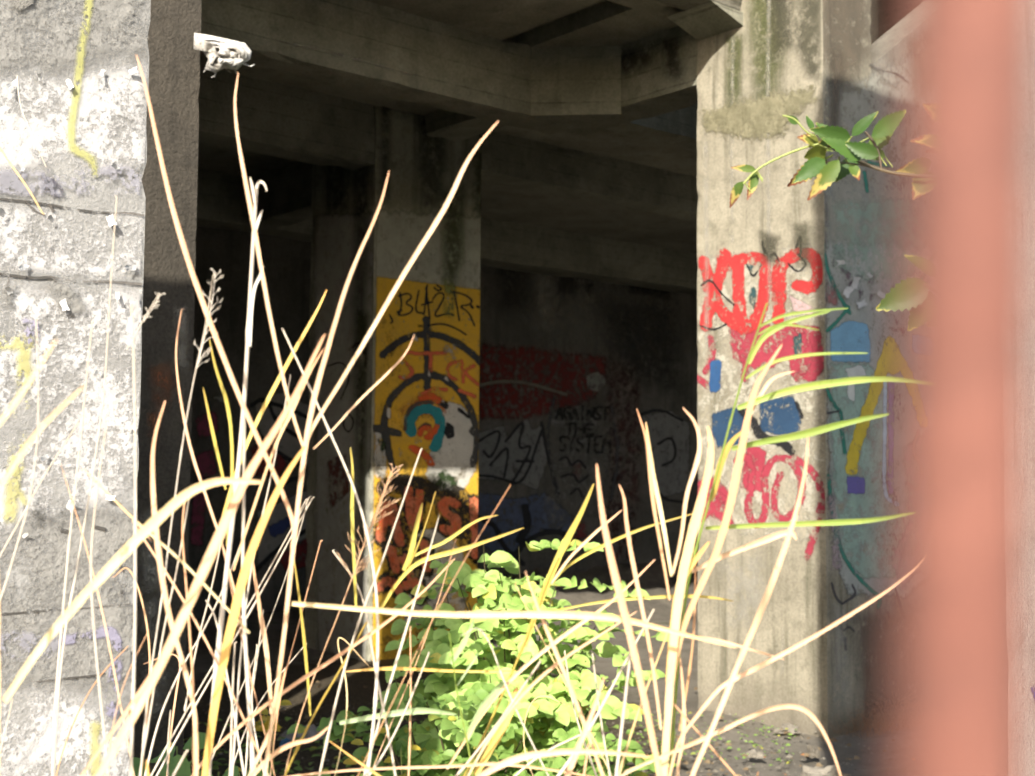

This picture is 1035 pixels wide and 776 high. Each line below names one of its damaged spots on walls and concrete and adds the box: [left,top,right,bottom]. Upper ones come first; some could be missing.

damp [727,0,872,127]
peeling [826,250,900,341]